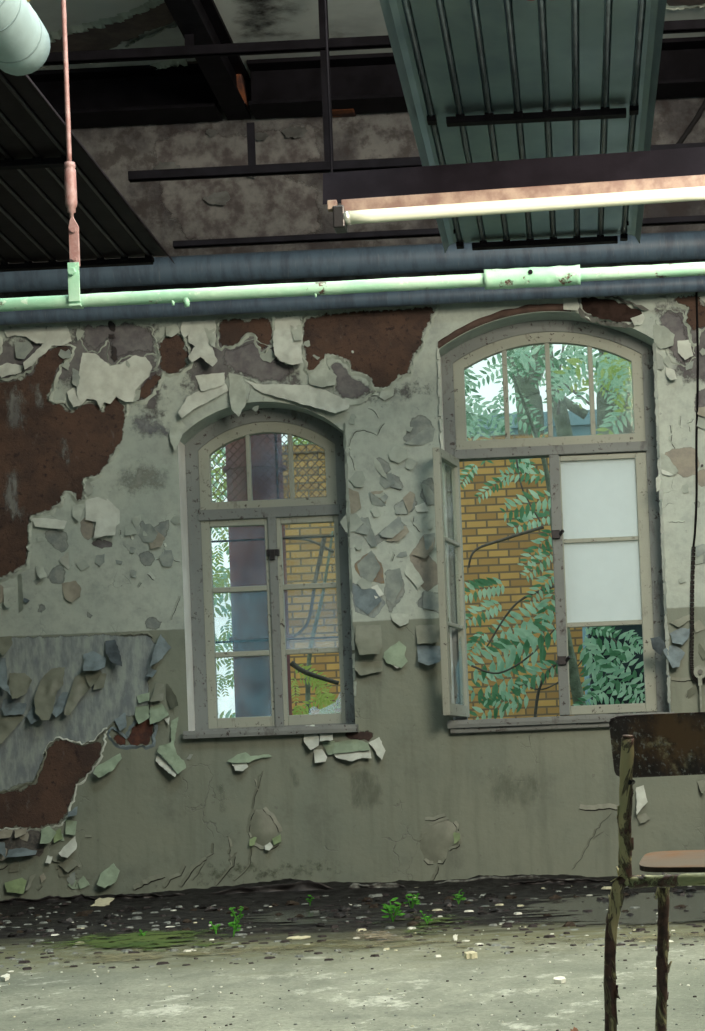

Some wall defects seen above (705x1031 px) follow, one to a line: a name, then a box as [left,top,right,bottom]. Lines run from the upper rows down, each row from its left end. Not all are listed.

water stain [244,0,278,35]
flaking render [0,293,705,703]
peeling [0,617,193,872]
peeling [228,752,271,771]
peeling [304,725,386,763]
peeling [5,874,36,894]
peeling [91,863,120,906]
crack [133,836,253,890]